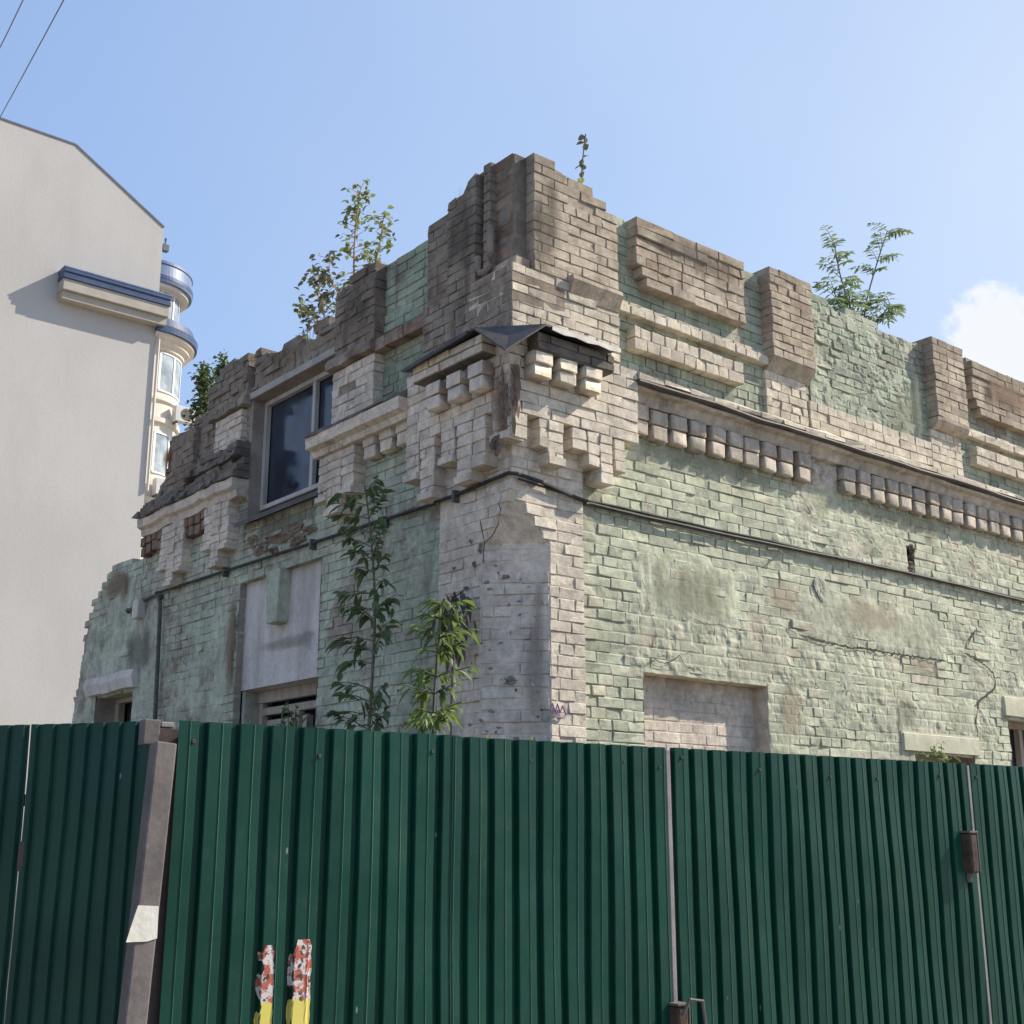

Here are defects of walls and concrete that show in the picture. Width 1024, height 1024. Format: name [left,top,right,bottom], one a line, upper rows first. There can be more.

water stain [106,574,126,600]
crack [777,624,1007,737]